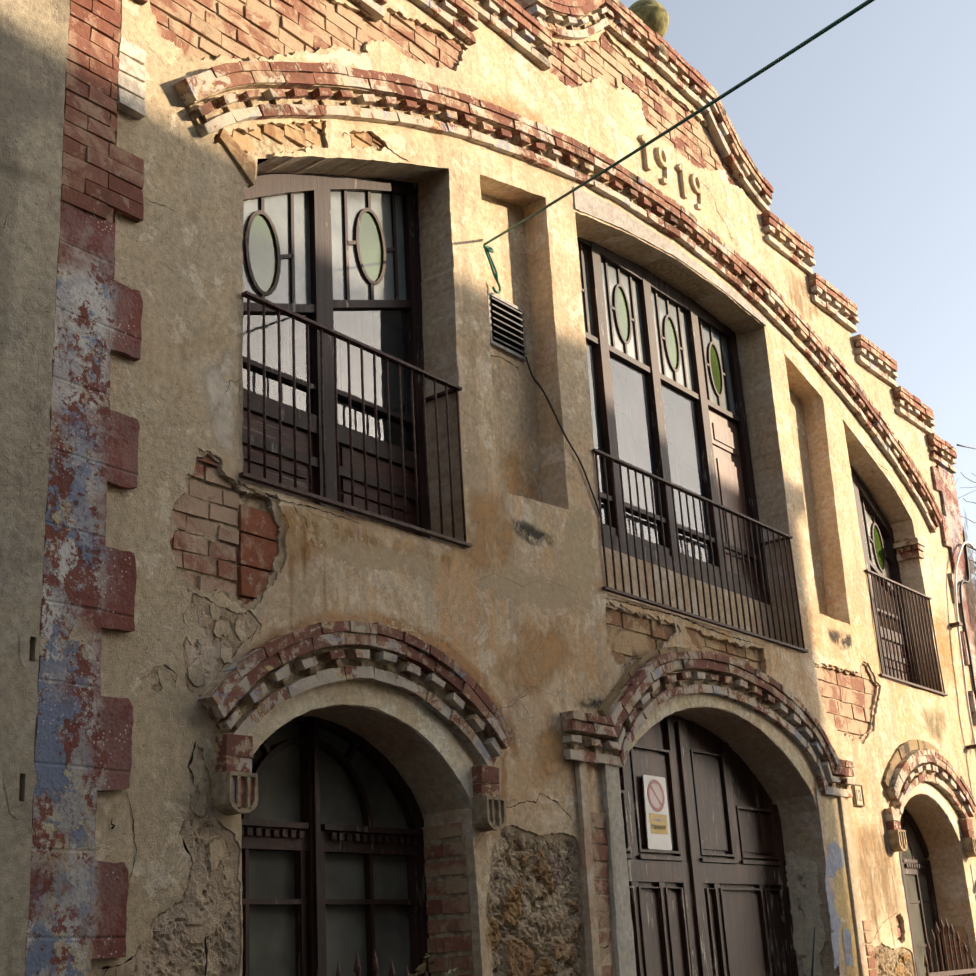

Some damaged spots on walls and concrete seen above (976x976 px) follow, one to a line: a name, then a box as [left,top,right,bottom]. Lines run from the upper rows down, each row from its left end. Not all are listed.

flaking render [146,449,288,696]
flaking render [604,602,762,671]
flaking render [814,662,880,743]
flaking render [100,737,241,976]
flaking render [420,822,475,976]
flaking render [485,825,587,976]
crack [506,793,579,829]
flaking render [590,812,613,976]
peeling [784,841,854,976]
flaking render [862,916,915,976]